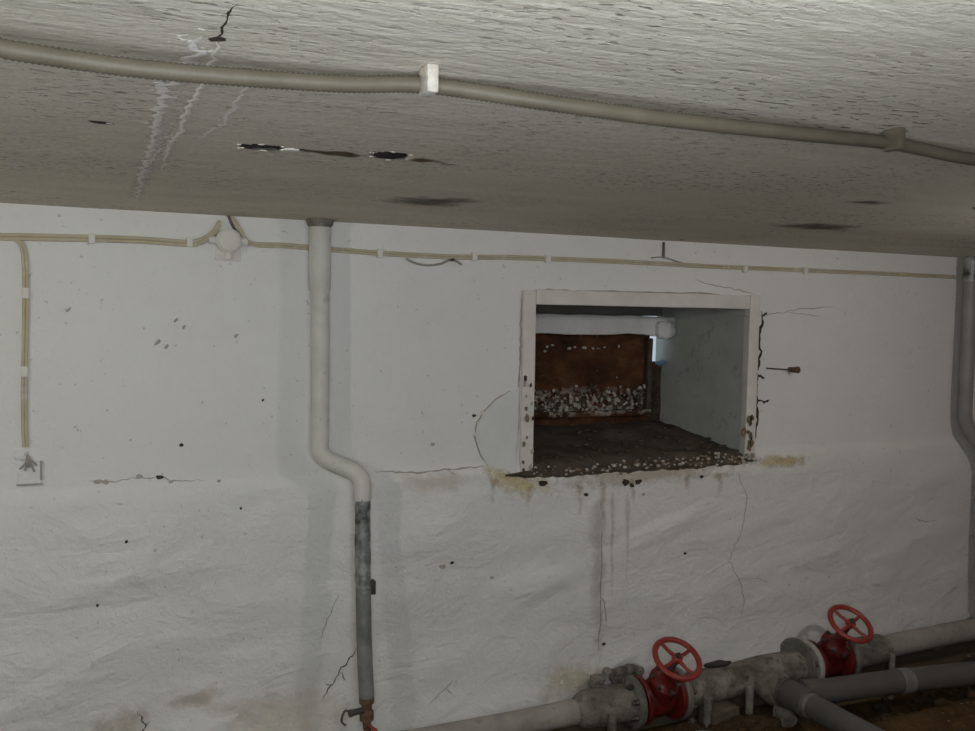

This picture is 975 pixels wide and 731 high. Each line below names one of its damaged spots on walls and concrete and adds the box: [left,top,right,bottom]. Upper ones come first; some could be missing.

crack [323,649,356,697]